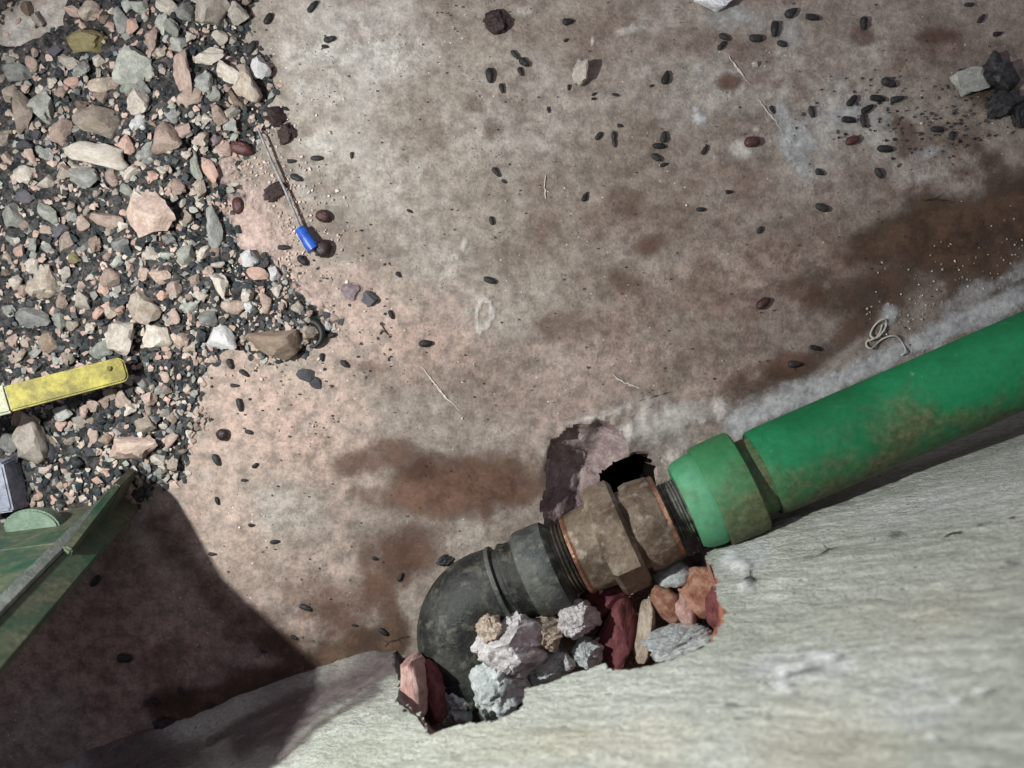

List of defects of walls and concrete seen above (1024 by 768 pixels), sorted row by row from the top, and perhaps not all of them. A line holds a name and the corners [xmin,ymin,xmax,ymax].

damp [775,104,816,177]
damp [832,107,861,125]
damp [968,89,993,103]
damp [725,157,1024,440]
spalling [539,398,728,527]
spalling [677,537,753,642]
spalling [393,652,480,735]